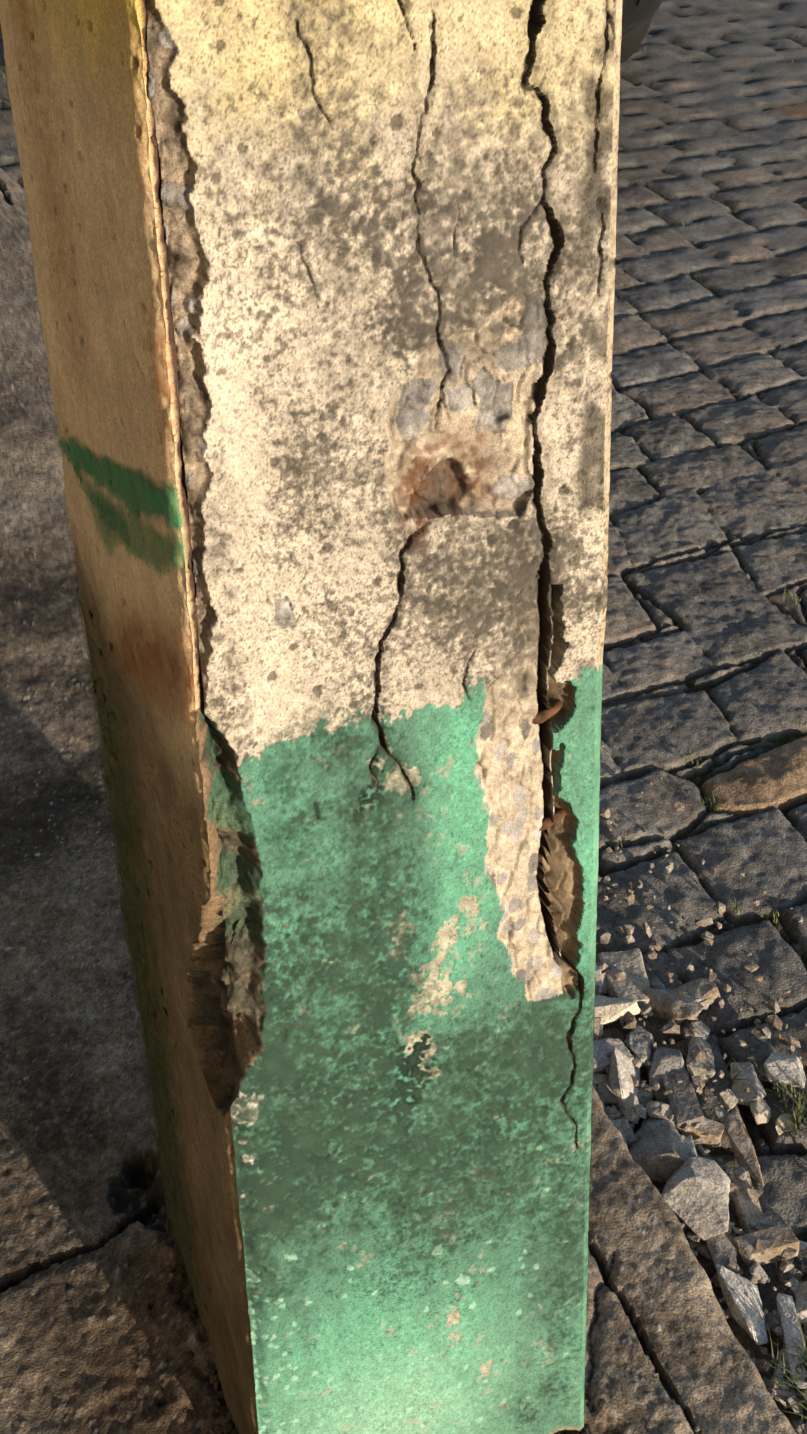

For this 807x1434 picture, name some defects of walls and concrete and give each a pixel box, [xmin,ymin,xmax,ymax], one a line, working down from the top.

crack [397,0,462,429]
crack [516,0,606,574]
crack [591,0,617,173]
spalling [136,0,268,1117]
crack [367,521,431,801]
corrosion [405,458,427,527]
corrosion [444,439,492,491]
spalling [387,564,585,1084]
crack [560,962,586,1149]